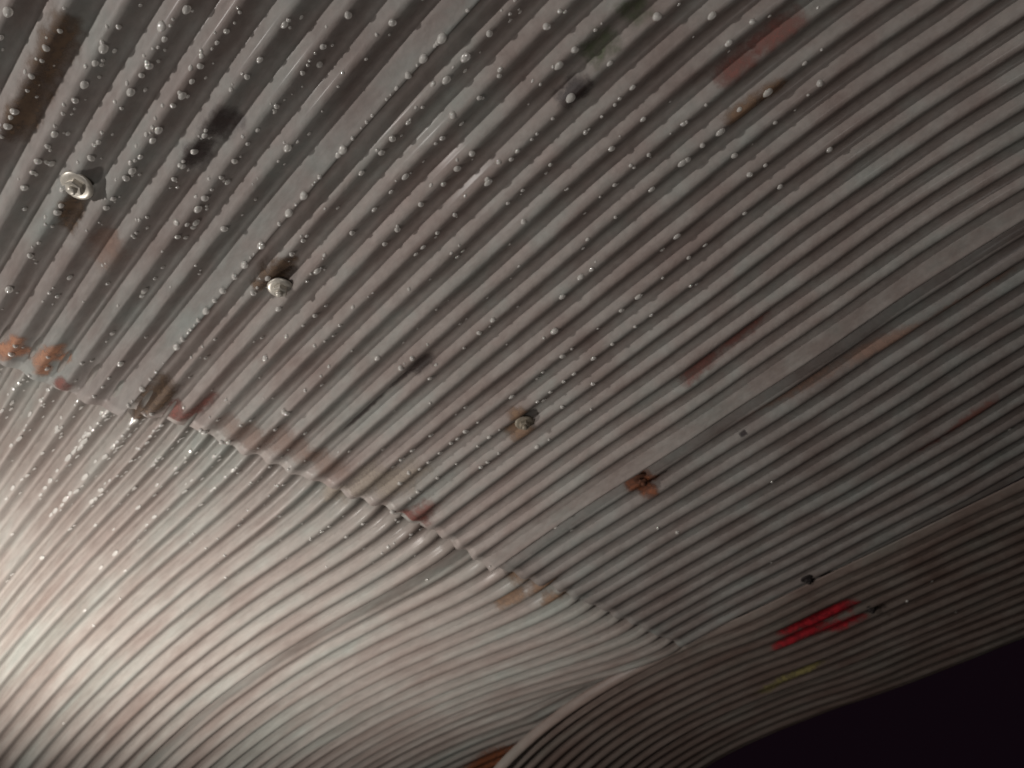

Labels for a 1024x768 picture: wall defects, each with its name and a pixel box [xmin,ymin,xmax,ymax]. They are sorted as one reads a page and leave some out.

corrosion [0,336,70,391]
corrosion [401,505,434,521]